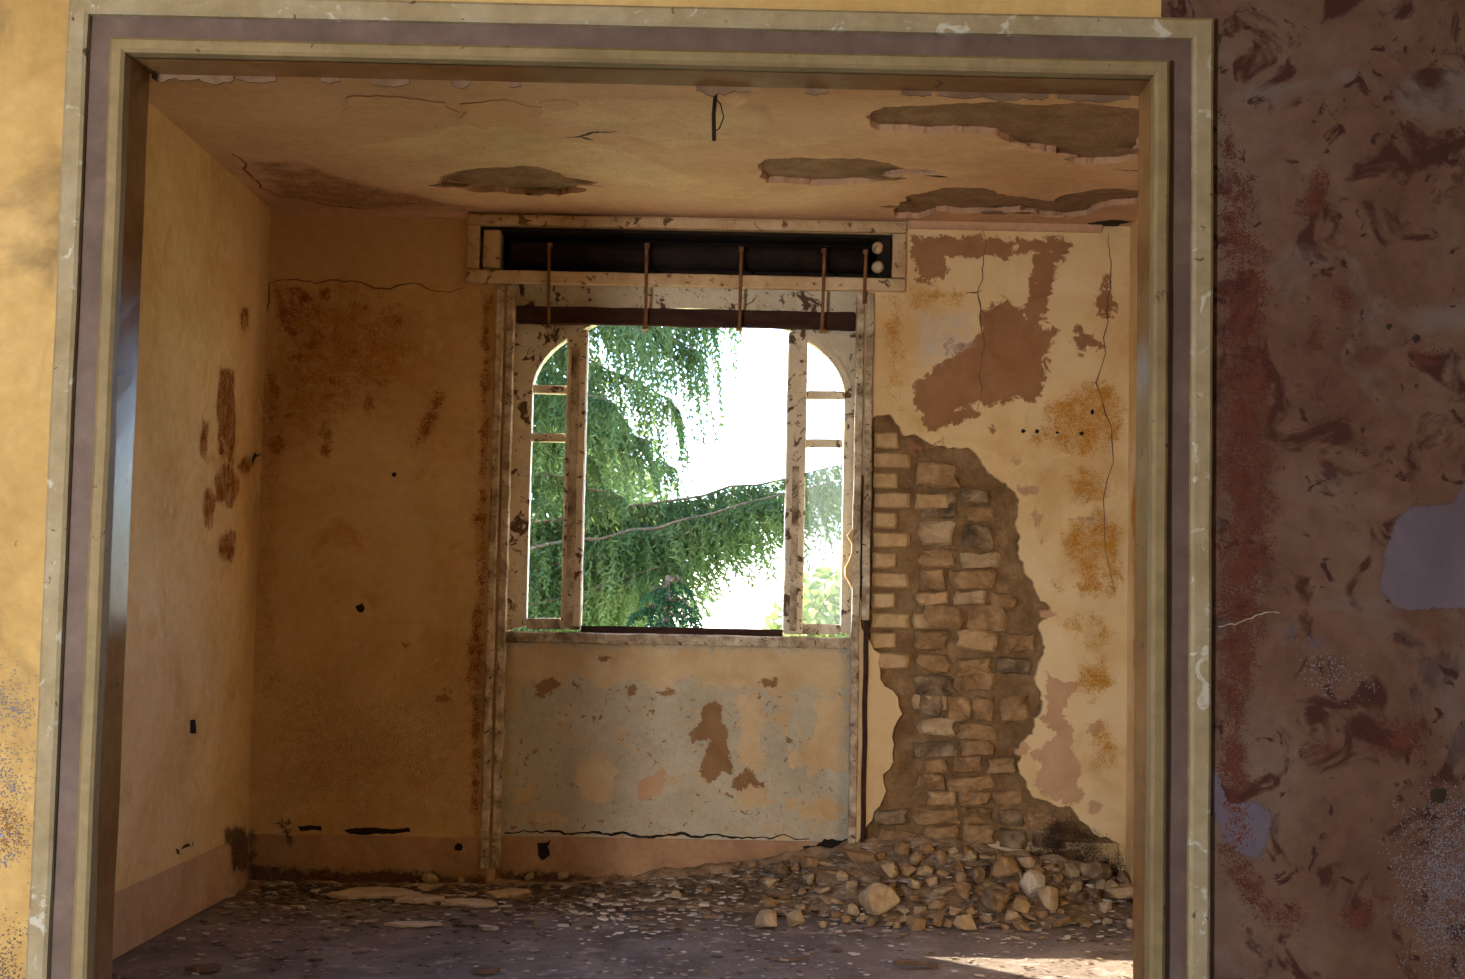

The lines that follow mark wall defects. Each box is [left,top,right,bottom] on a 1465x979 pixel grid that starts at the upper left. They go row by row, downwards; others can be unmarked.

peeling [151,74,277,85]
spalling [871,90,1139,159]
spalling [428,165,603,196]
spalling [506,157,1138,861]
damp [1027,378,1136,773]